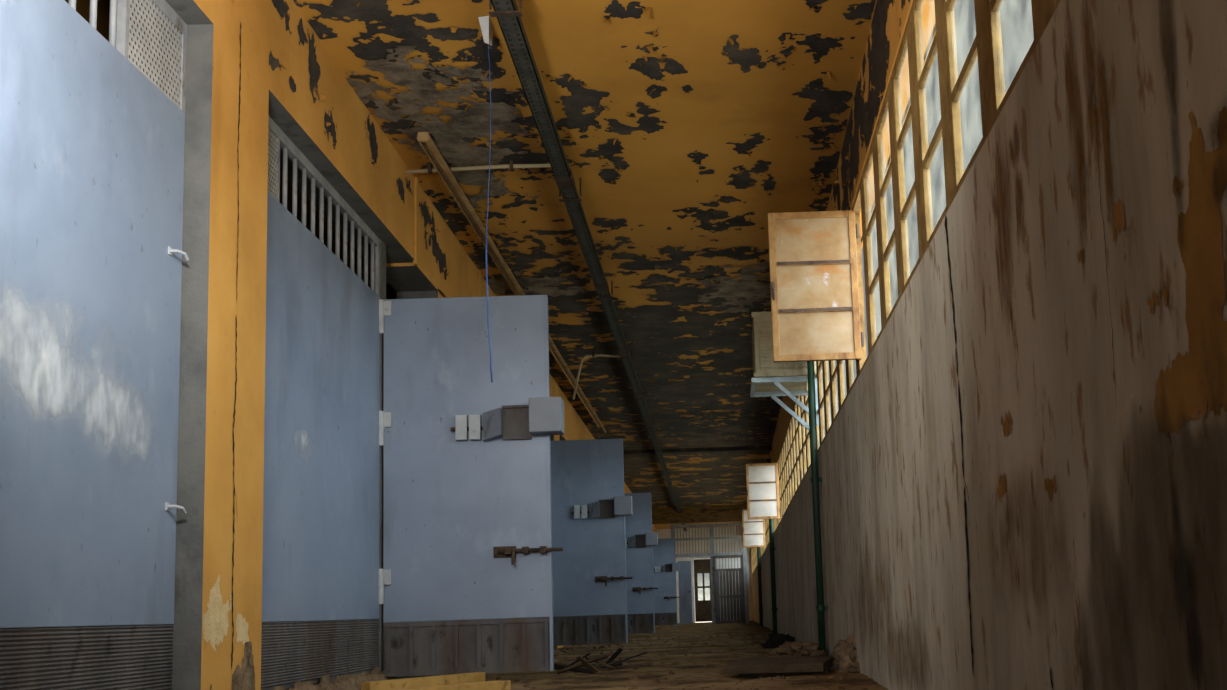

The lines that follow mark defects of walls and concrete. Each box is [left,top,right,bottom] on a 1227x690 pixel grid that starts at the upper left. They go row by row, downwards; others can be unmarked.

crack [235,24,243,288]
peeling [269,0,783,507]
peeling [721,0,910,212]
peeling [1140,106,1227,435]
peeling [202,574,255,690]
crack [230,317,238,670]
peeling [1001,409,1013,438]
leakage [1081,423,1227,690]